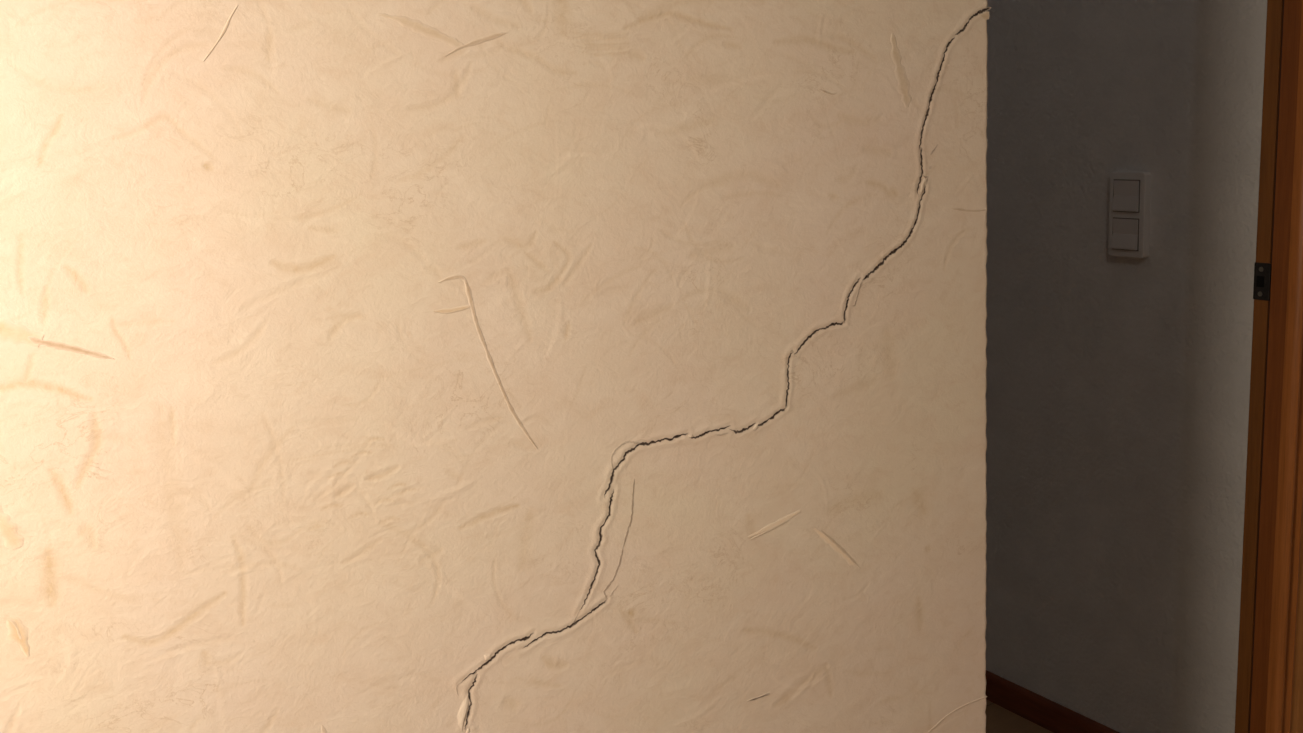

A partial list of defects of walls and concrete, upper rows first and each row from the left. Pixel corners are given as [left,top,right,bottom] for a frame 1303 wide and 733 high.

crack [456,7,991,733]